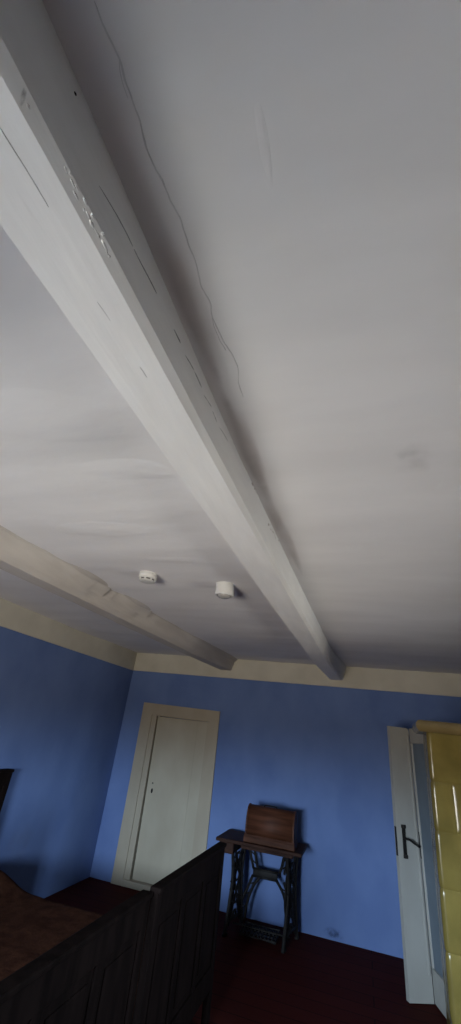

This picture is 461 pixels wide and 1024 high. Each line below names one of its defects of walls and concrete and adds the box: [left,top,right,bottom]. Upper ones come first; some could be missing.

crack [94,1,243,396]